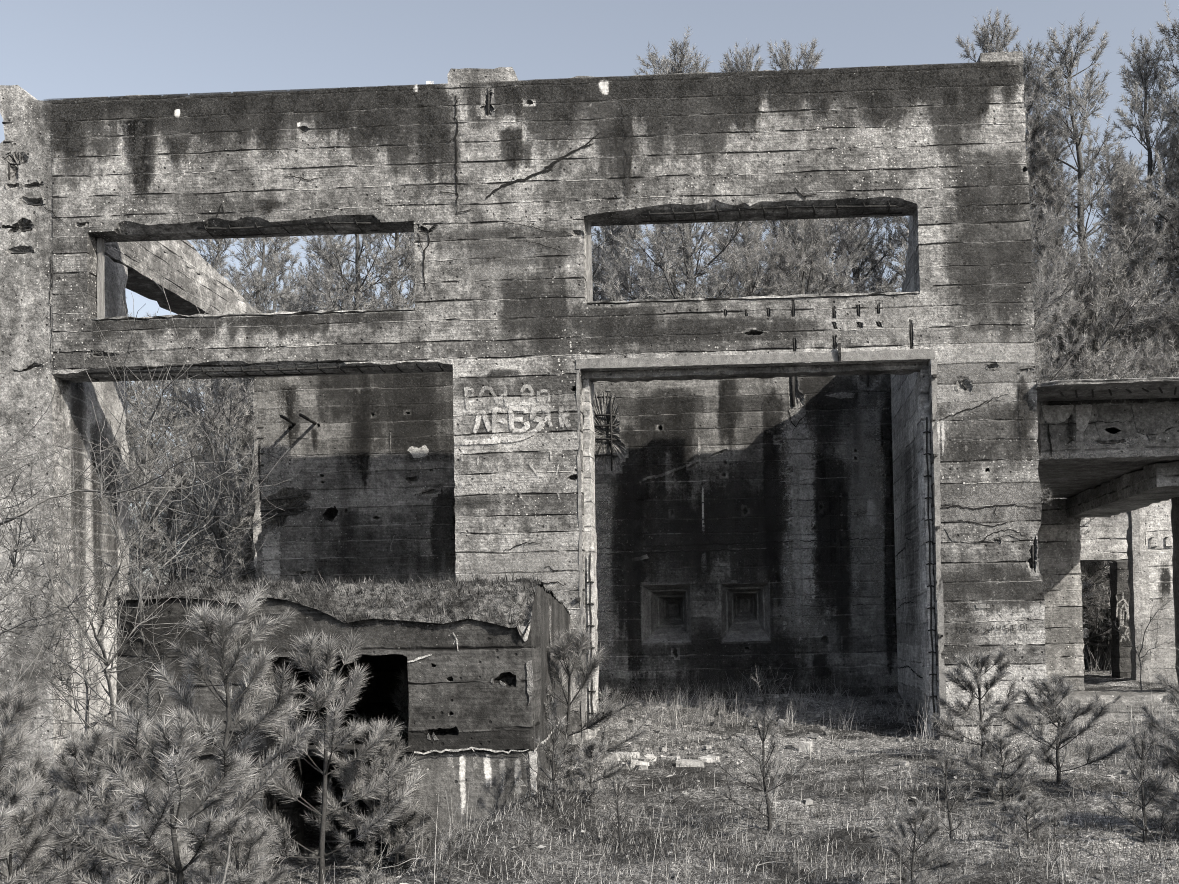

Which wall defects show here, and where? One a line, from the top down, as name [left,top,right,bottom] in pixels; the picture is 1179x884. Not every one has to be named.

spalling [0,141,46,255]
crack [417,96,601,290]
leakage [44,61,1037,339]
leakage [502,275,818,346]
leakage [260,384,318,496]
leakage [318,372,454,486]
leakage [262,531,281,582]
leakage [312,485,456,585]
leakage [611,375,897,686]
leakage [483,754,521,795]